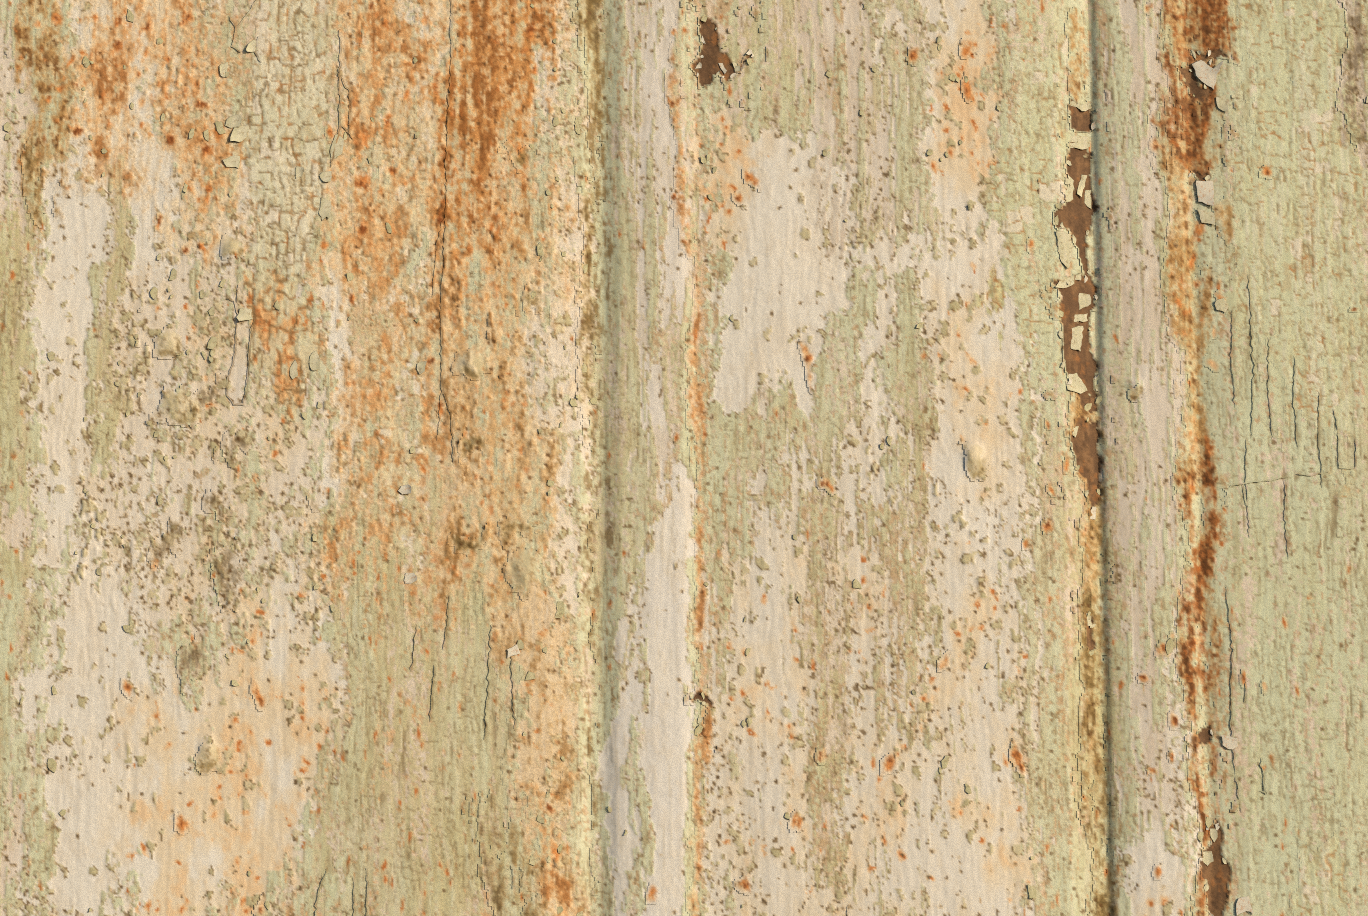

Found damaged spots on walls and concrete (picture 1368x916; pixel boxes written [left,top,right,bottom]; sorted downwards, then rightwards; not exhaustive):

peeling [0,19,357,916]
corrosion [8,0,599,916]
crack [215,0,455,463]
crack [386,484,422,584]
crack [410,596,451,719]
crack [484,624,517,740]
peeling [484,639,565,798]
peeling [524,0,1238,916]
corrosion [1136,0,1269,916]
peeling [1236,896,1254,916]